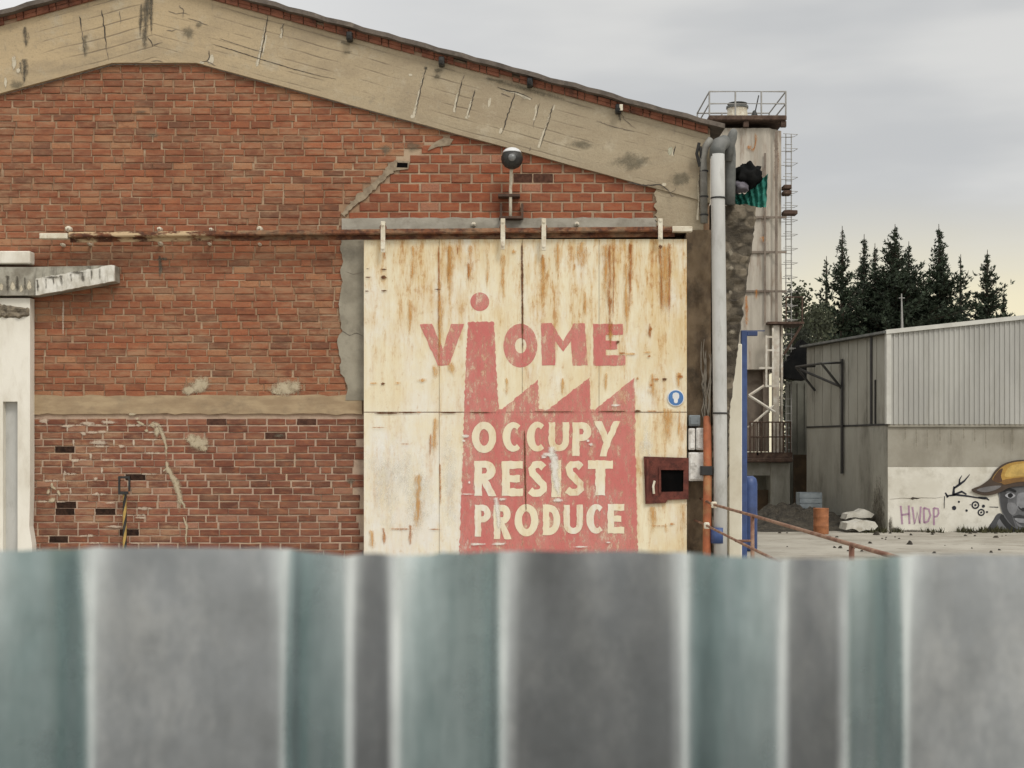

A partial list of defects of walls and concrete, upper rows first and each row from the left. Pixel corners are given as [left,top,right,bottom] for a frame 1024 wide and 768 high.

crack [0,6,555,151]
hole [396,160,410,171]
rust [435,245,472,344]
rust [501,245,524,346]
rust [603,243,650,357]
rust [659,244,671,306]
rust [600,409,680,436]